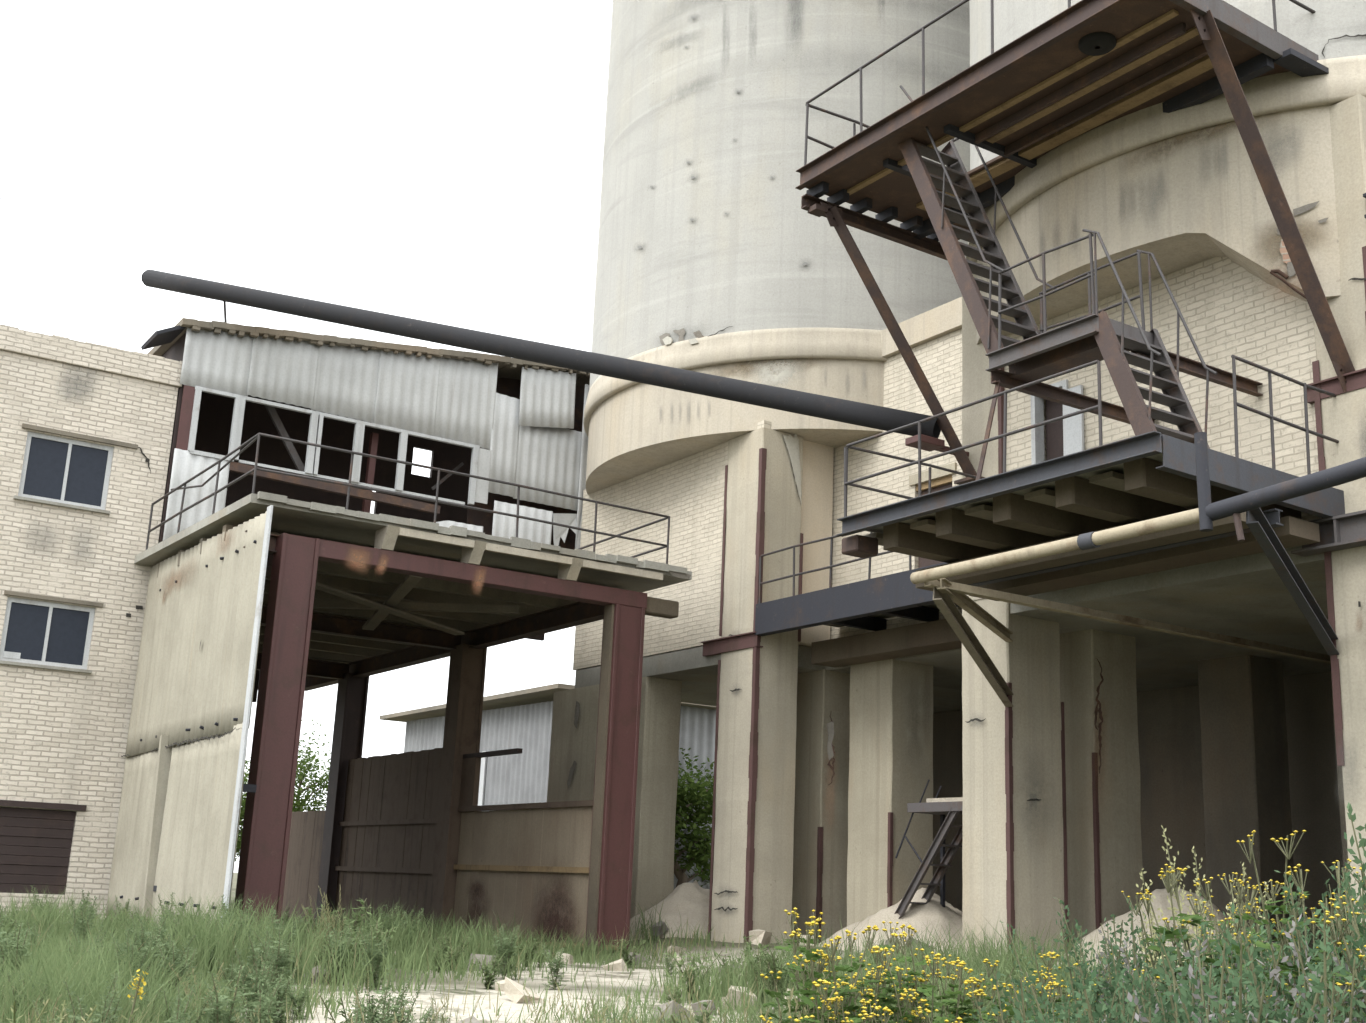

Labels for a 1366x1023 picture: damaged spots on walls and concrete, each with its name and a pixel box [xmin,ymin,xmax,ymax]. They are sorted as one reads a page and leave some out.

crack [1322,34,1366,58]
spalling [1293,201,1329,245]
spalling [1265,228,1306,299]
crack [1094,659,1104,774]